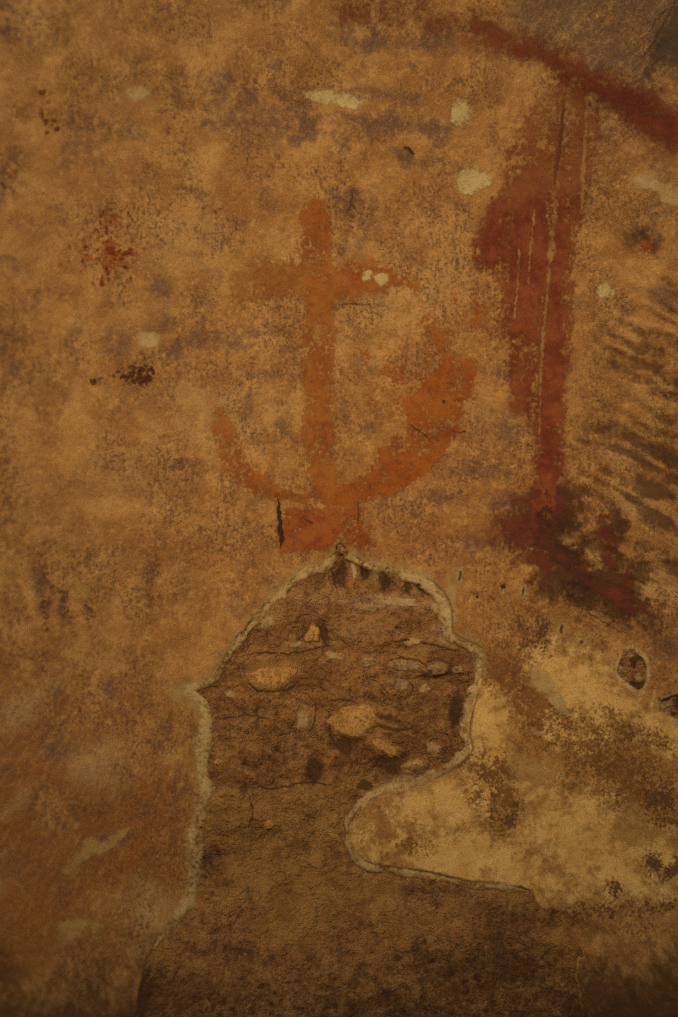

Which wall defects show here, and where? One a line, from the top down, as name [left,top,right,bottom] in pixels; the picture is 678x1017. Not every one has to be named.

damp [612,331,678,399]
crack [277,497,313,548]
damp [600,415,678,536]
flaking render [132,532,678,1017]